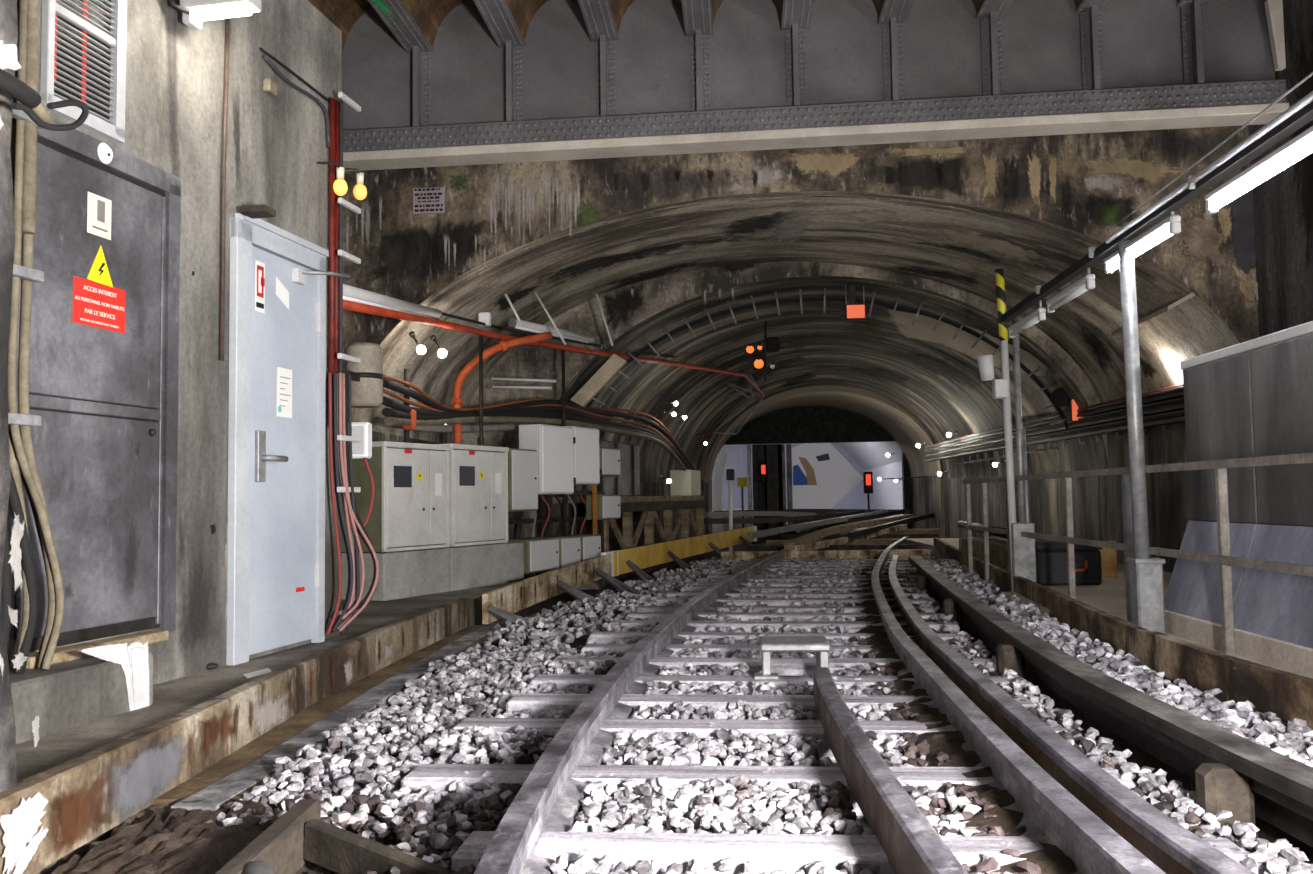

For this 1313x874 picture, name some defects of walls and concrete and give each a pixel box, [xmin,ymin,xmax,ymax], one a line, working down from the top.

flaking render [0,40,22,70]
water stain [1292,30,1313,102]
water stain [345,171,580,279]
water stain [614,163,782,201]
water stain [884,159,968,195]
water stain [911,242,1003,264]
water stain [983,153,1136,227]
water stain [1293,152,1313,264]
peeling [79,641,150,711]
corrosion [189,702,253,768]
peeling [0,793,49,874]
corrosion [51,775,107,856]